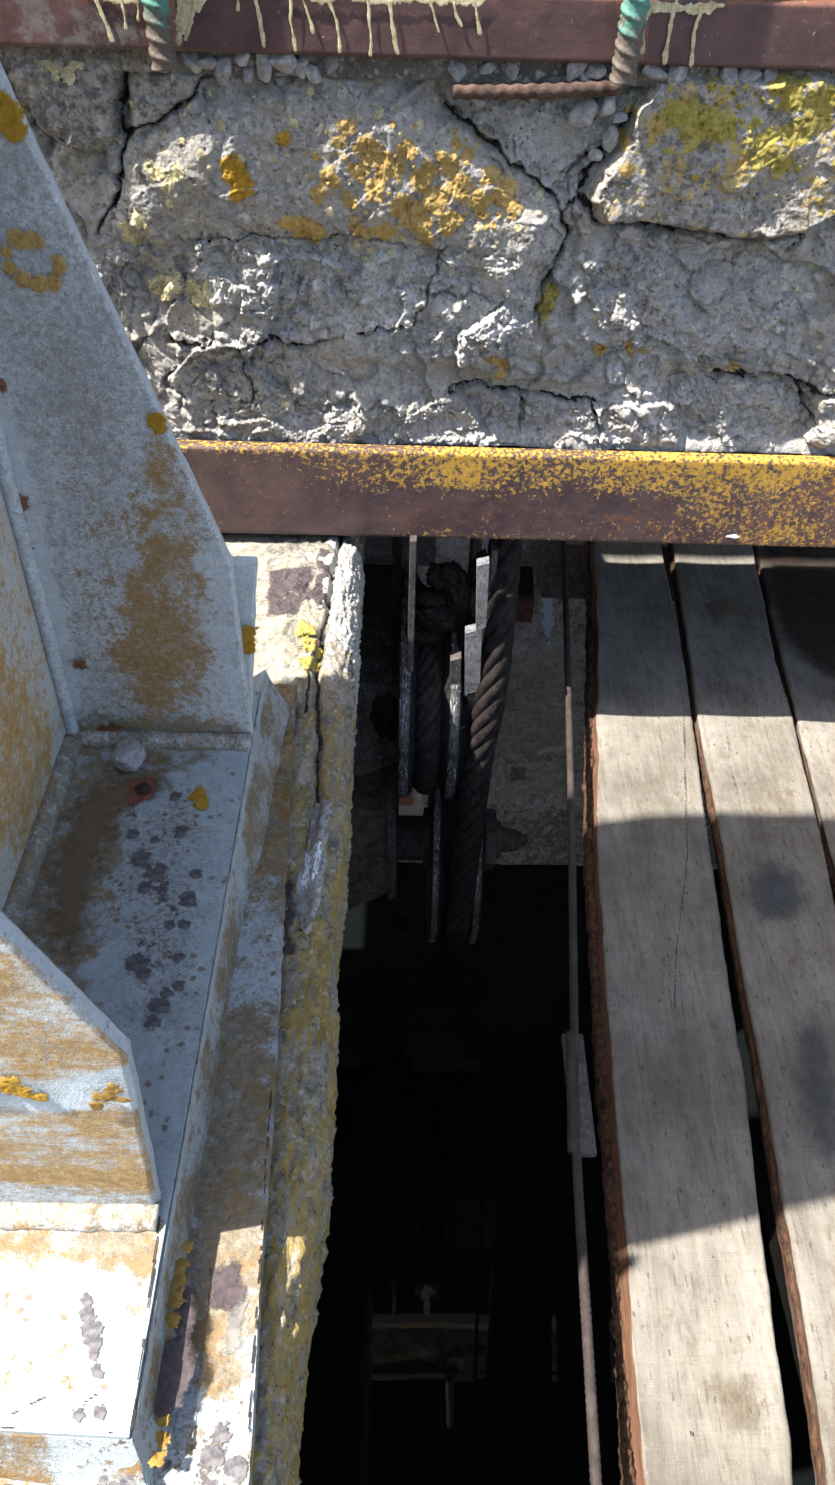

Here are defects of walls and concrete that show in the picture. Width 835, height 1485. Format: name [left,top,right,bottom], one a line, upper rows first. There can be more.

spalling [687,66,835,78]
spalling [0,46,670,188]
crack [100,71,202,225]
crack [444,102,633,319]
crack [639,221,802,248]
crack [448,378,597,416]
crack [712,368,835,433]
corrosion [19,493,30,511]
corrosion [69,658,88,669]
corrosion [96,723,121,731]